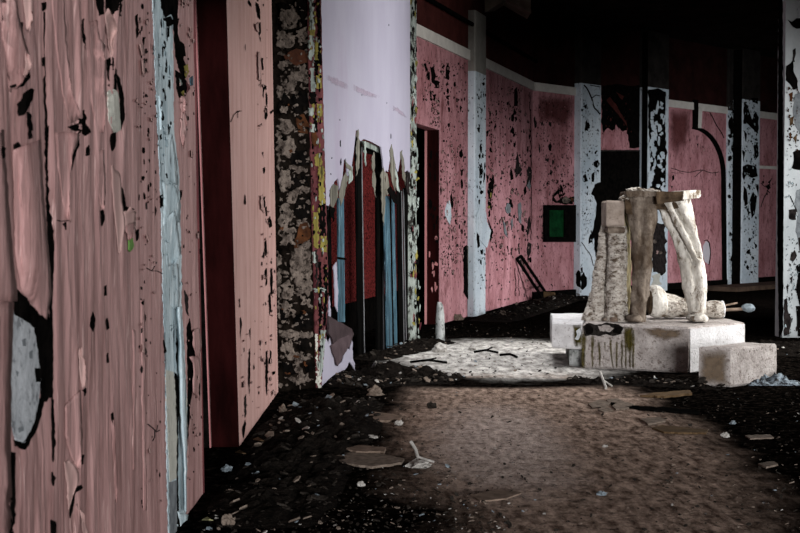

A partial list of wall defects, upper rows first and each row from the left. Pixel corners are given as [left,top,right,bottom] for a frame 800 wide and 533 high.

peeling [0,0,139,533]
peeling [152,0,202,533]
flaking render [240,0,674,438]
damp [576,330,635,368]
flaking render [728,0,800,337]